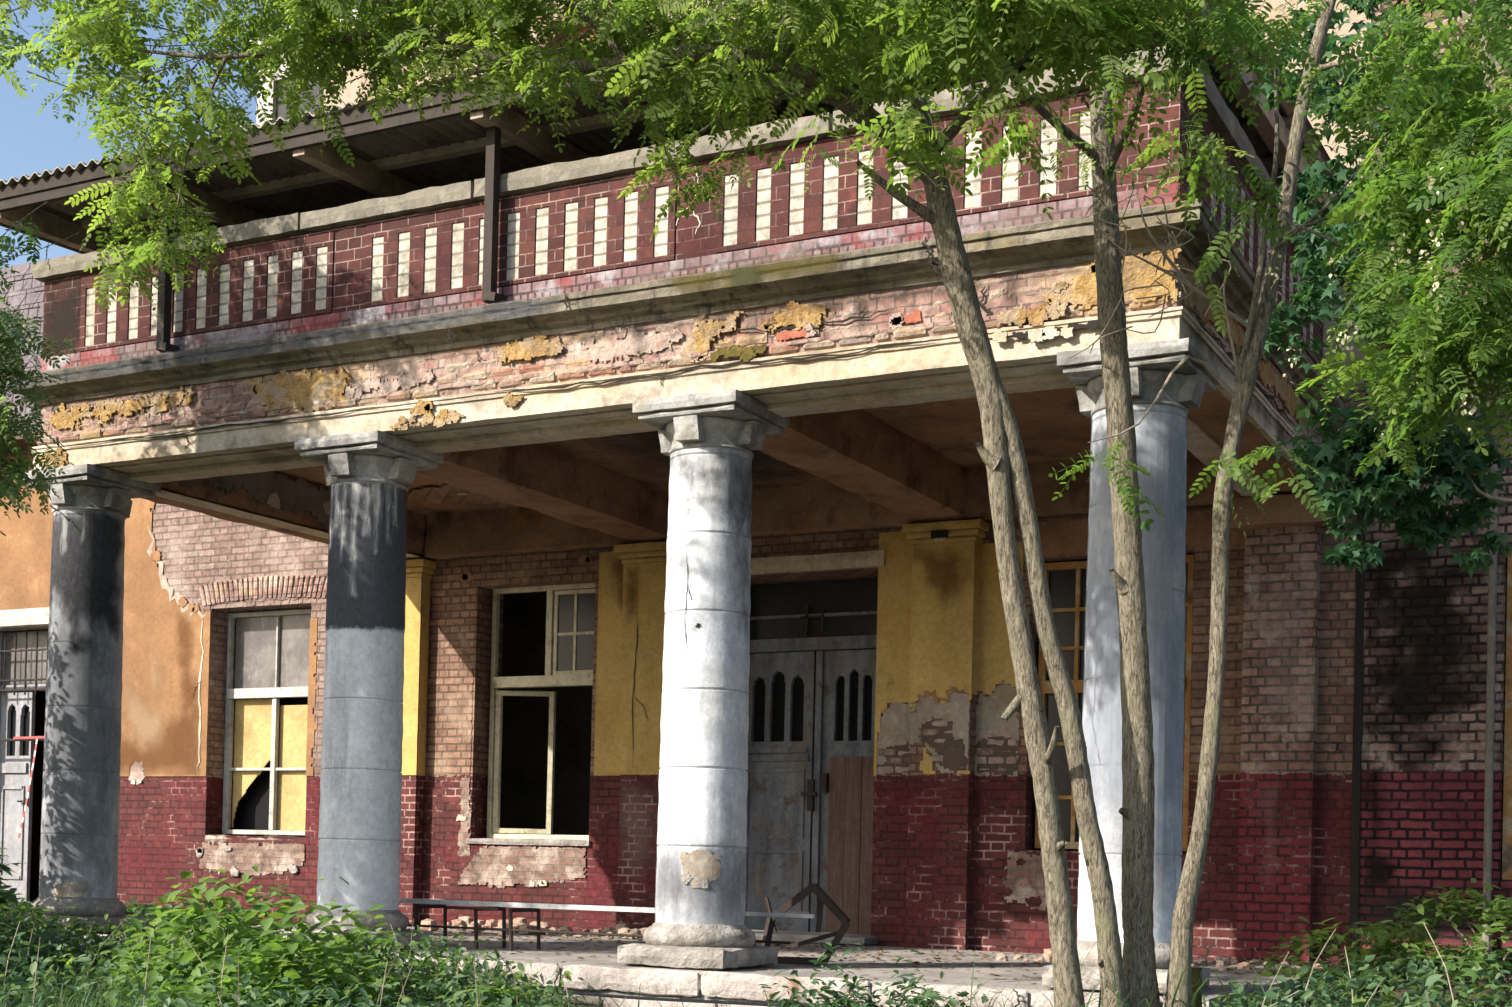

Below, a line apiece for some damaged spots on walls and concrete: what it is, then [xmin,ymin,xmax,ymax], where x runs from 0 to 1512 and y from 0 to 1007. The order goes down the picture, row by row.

peeling [497,311,745,364]
peeling [760,299,827,342]
peeling [992,260,1098,343]
peeling [1121,246,1245,359]
peeling [38,385,195,467]
peeling [251,367,464,431]
water stain [330,482,397,548]
peeling [147,471,331,775]
peeling [426,554,599,889]
peeling [874,681,1019,777]
spalling [680,850,723,888]
spalling [1003,851,1047,910]